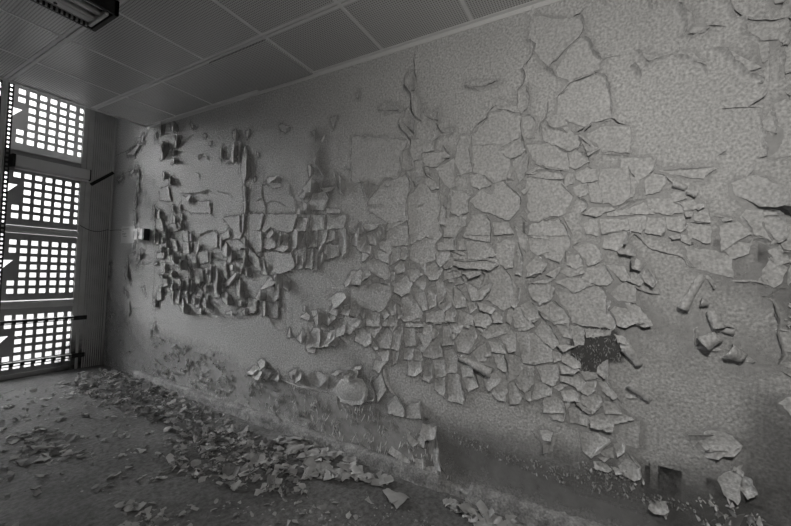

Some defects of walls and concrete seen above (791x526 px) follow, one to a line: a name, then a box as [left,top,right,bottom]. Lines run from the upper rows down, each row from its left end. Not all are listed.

peeling [147,0,791,499]
peeling [636,428,776,526]